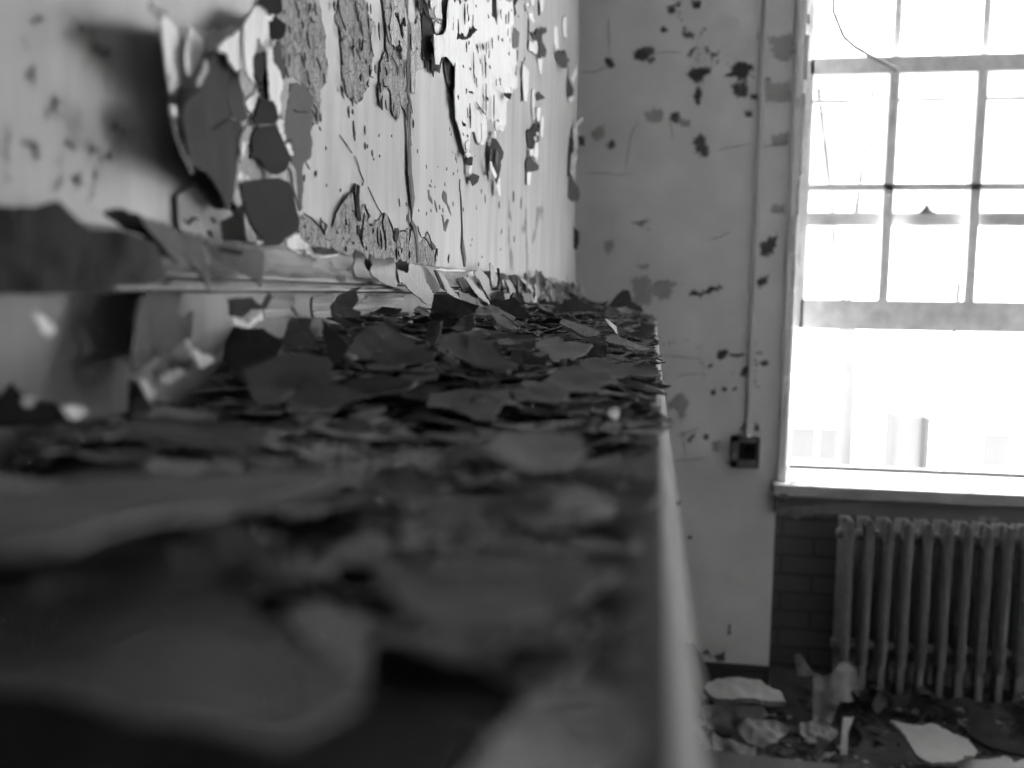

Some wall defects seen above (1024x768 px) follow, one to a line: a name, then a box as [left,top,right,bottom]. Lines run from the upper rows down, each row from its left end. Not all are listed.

peeling [0,0,674,768]
peeling [706,12,752,64]